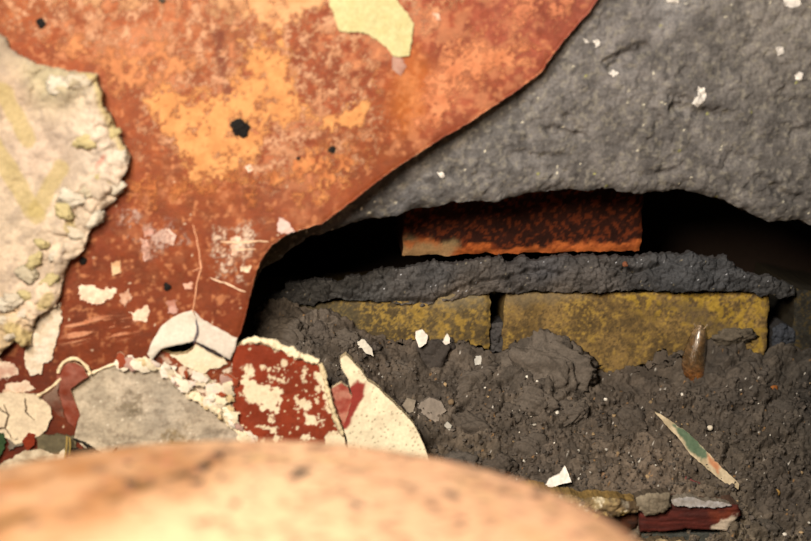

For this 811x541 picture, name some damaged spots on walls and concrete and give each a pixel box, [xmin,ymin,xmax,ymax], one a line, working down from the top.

peeling [412,0,574,128]
peeling [0,0,457,456]
peeling [545,465,571,487]
peeling [670,493,731,508]